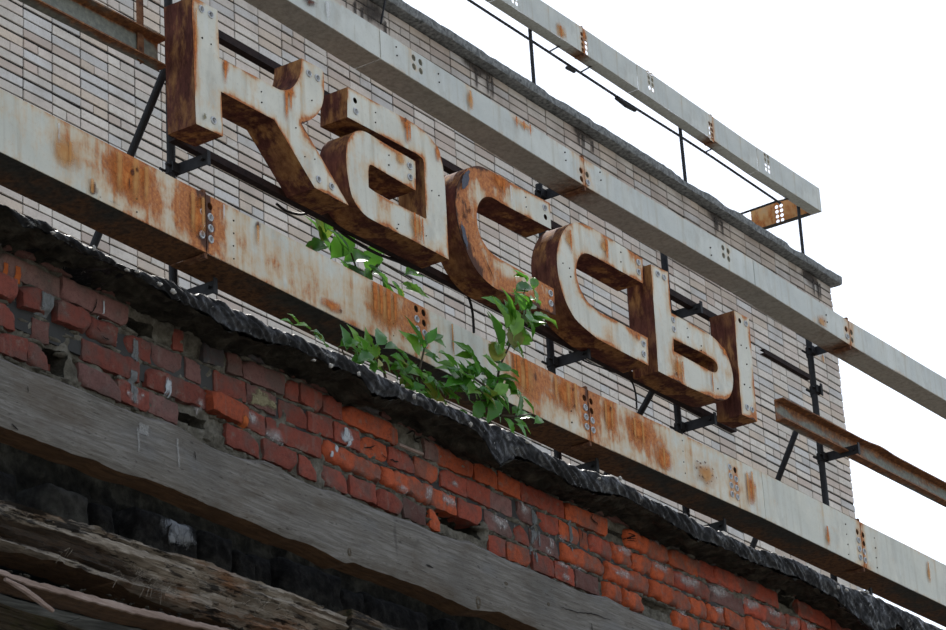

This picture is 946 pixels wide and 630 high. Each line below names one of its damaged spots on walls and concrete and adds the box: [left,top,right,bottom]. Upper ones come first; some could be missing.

rust [56,142,79,163]
rust [494,174,506,193]
rust [191,193,205,234]
rust [323,299,342,313]
rust [604,400,615,427]
rust [657,447,671,469]